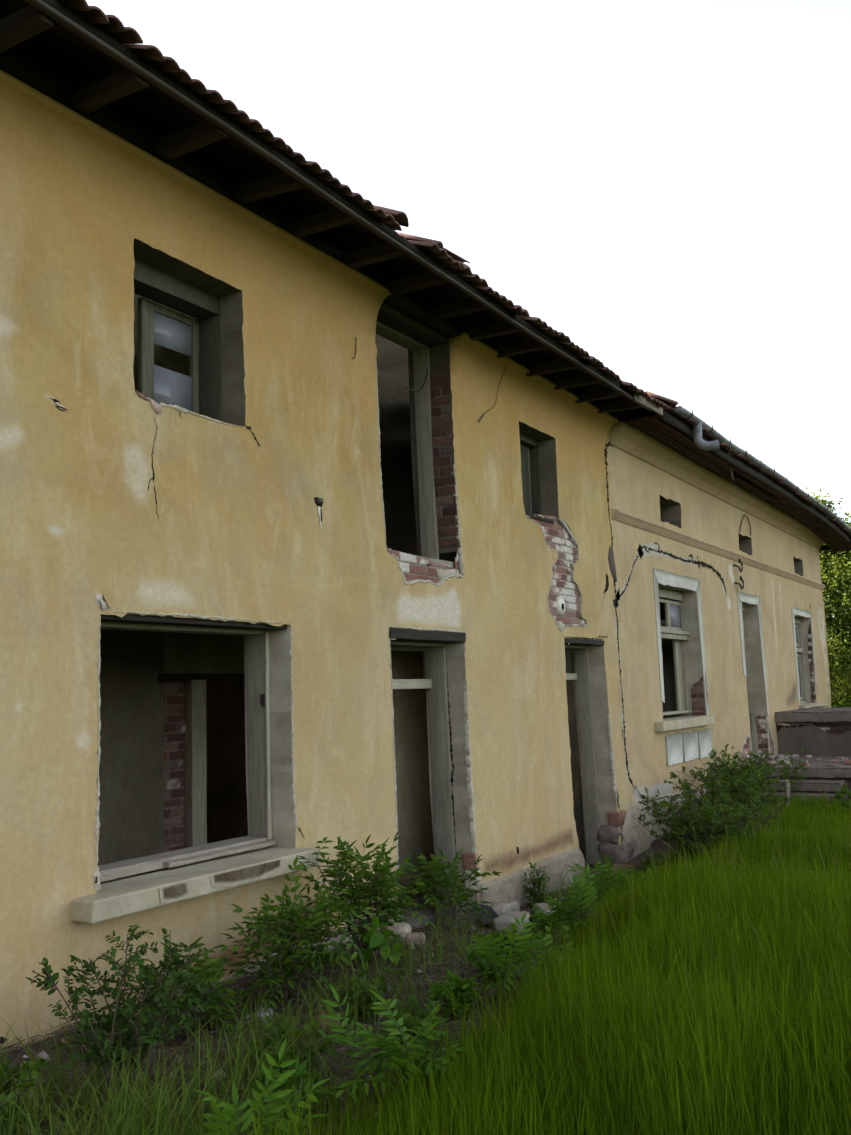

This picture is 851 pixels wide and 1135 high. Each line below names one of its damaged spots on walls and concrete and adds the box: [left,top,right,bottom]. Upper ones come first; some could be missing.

crack [148,412,181,518]
flaking render [376,360,465,923]
flaking render [526,514,608,640]
crack [603,441,732,799]